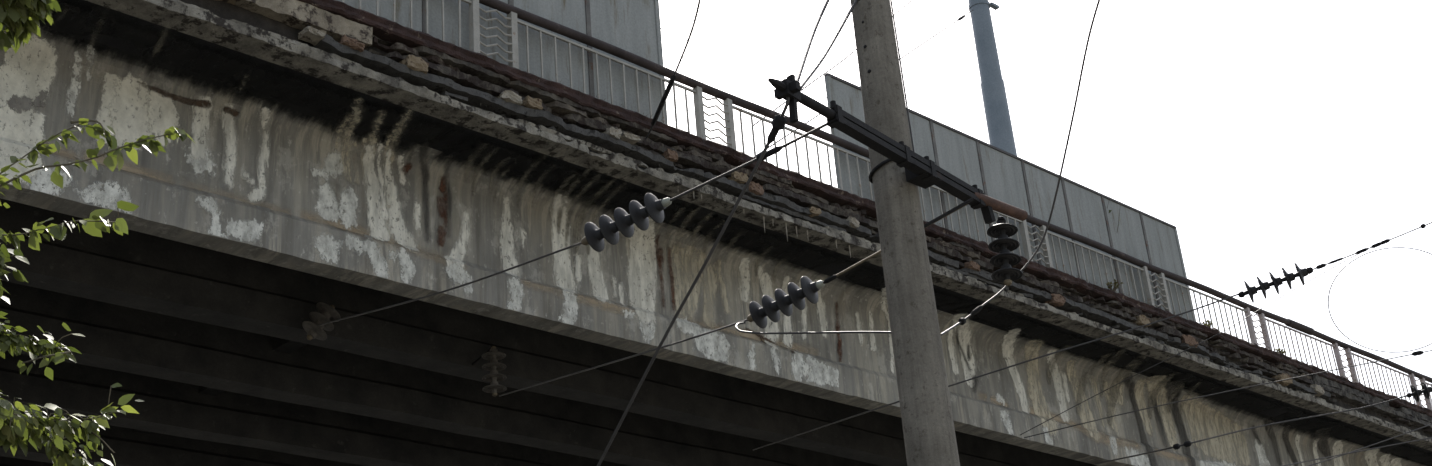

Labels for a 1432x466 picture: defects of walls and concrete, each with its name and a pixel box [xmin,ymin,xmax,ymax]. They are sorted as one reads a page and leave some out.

spalling [399,55,429,74]
spalling [497,90,543,110]
efflorescence [191,97,270,202]
spalling [603,127,641,145]
corrosion [438,177,447,247]
water stain [306,98,827,351]
water stain [855,287,894,374]
water stain [947,313,1200,466]
peeling [1108,434,1150,466]
peeling [1181,395,1270,466]
water stain [1255,420,1345,466]
water stain [1364,448,1402,466]